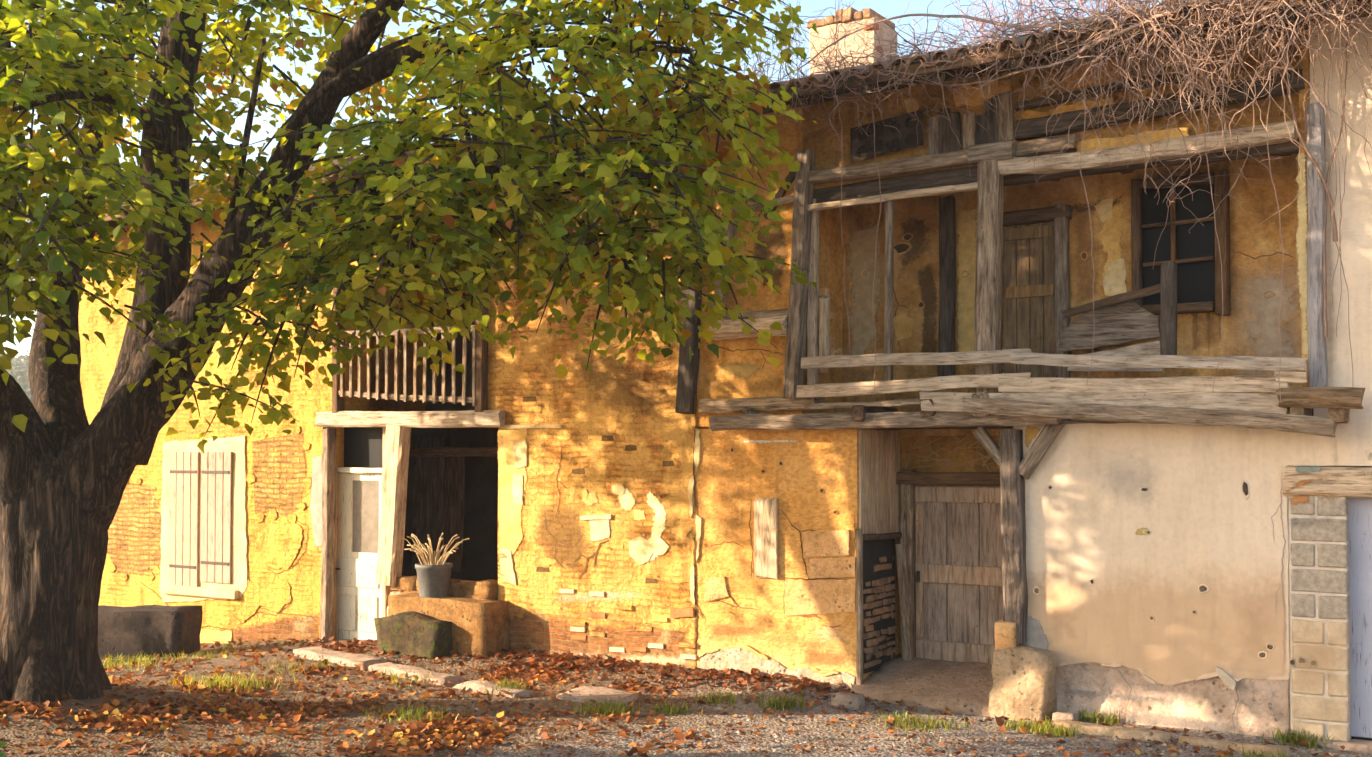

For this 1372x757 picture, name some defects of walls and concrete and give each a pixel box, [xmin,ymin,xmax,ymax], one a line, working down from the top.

flaking render [1080,195,1127,296]
peeling [611,484,625,494]
peeling [628,534,670,584]
crack [1271,481,1286,670]
spalling [509,588,720,660]
spalling [1257,642,1275,659]
flaking render [1055,656,1318,738]